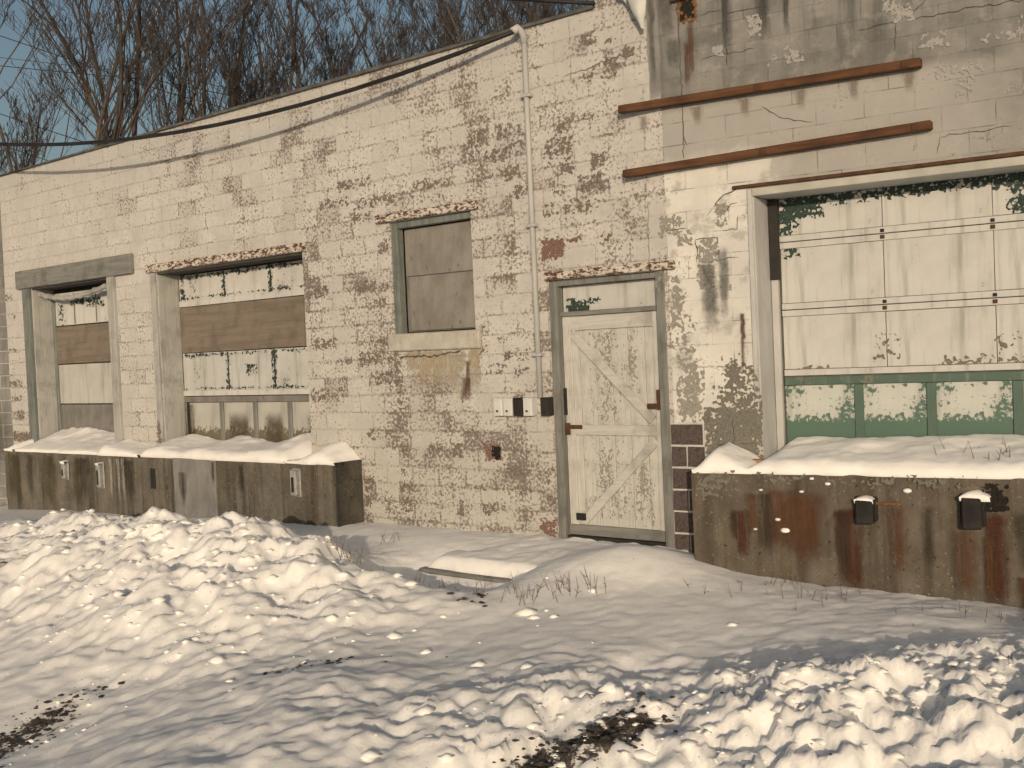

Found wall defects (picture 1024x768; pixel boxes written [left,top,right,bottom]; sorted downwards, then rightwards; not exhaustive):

leakage [649,0,672,67]
rust [685,27,693,78]
crack [862,0,1022,50]
peeling [465,114,528,200]
peeling [542,113,606,218]
peeling [778,171,1024,260]
peeling [180,260,330,301]
leakage [704,254,728,313]
peeling [654,200,764,459]
peeling [183,334,411,418]
rust [731,492,818,555]
rust [834,510,861,583]